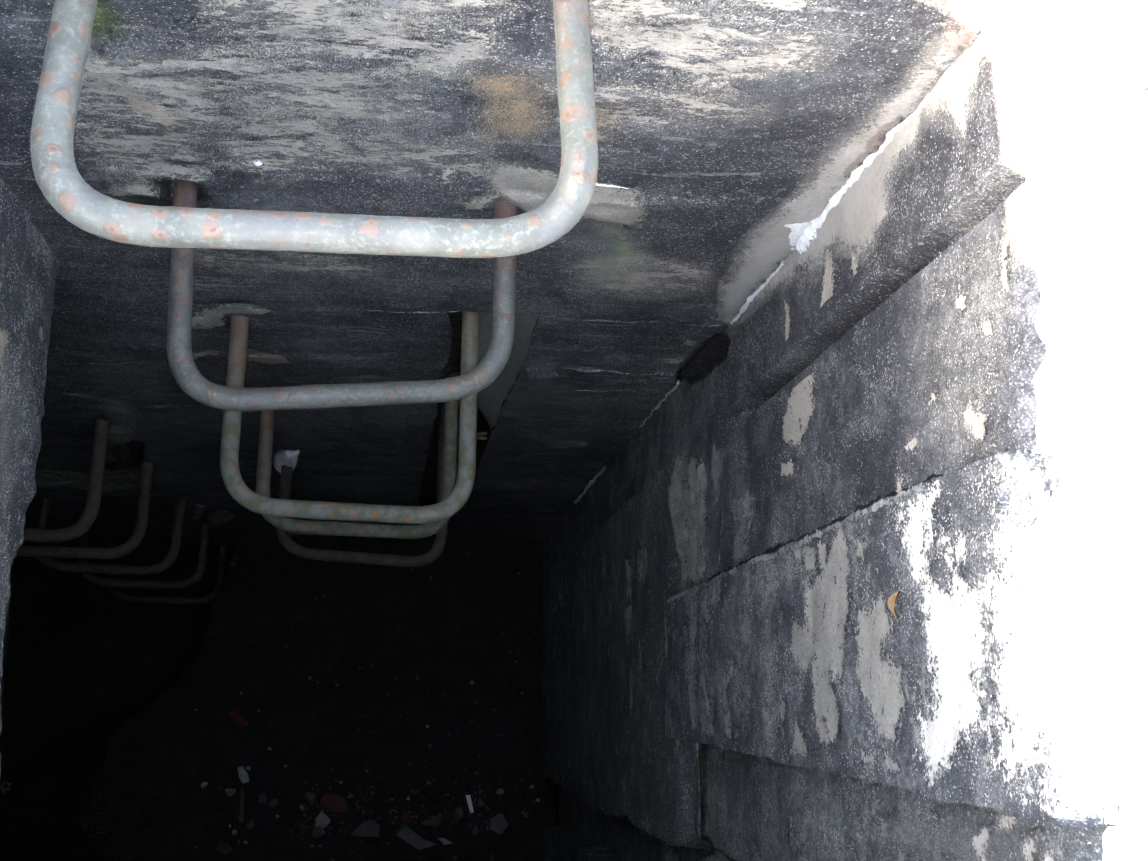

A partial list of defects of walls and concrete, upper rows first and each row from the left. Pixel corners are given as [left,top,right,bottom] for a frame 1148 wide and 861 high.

leakage [91,0,118,38]
spalling [75,0,518,203]
corrosion [476,73,552,142]
leakage [545,0,1014,326]
leakage [131,197,166,206]
spalling [1001,240,1009,292]
spalling [955,294,966,310]
spalling [981,320,993,336]
leakage [517,364,679,428]
spalling [780,373,816,477]
leakage [273,449,301,474]
spalling [779,416,1148,861]